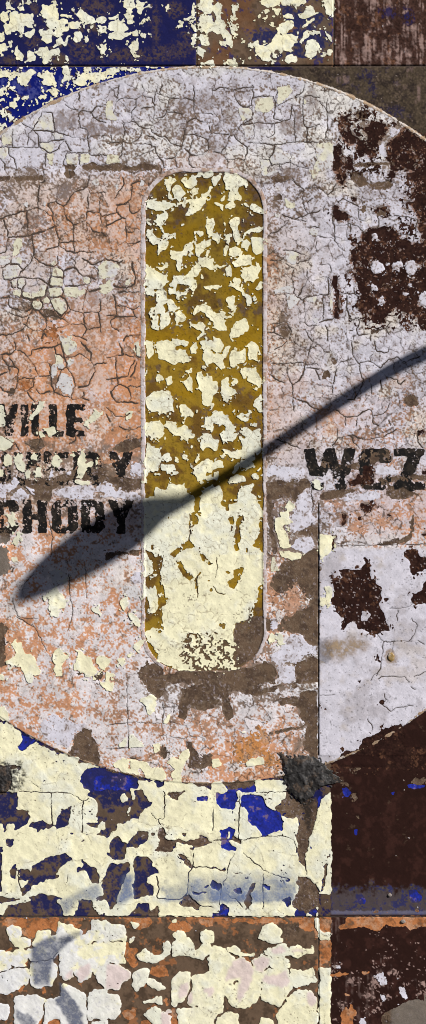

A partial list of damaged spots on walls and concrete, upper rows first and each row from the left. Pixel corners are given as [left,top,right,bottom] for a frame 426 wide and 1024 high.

peeling [0,0,171,131]
peeling [176,0,336,70]
crack [0,85,423,449]
peeling [0,162,426,772]
peeling [0,706,426,1024]